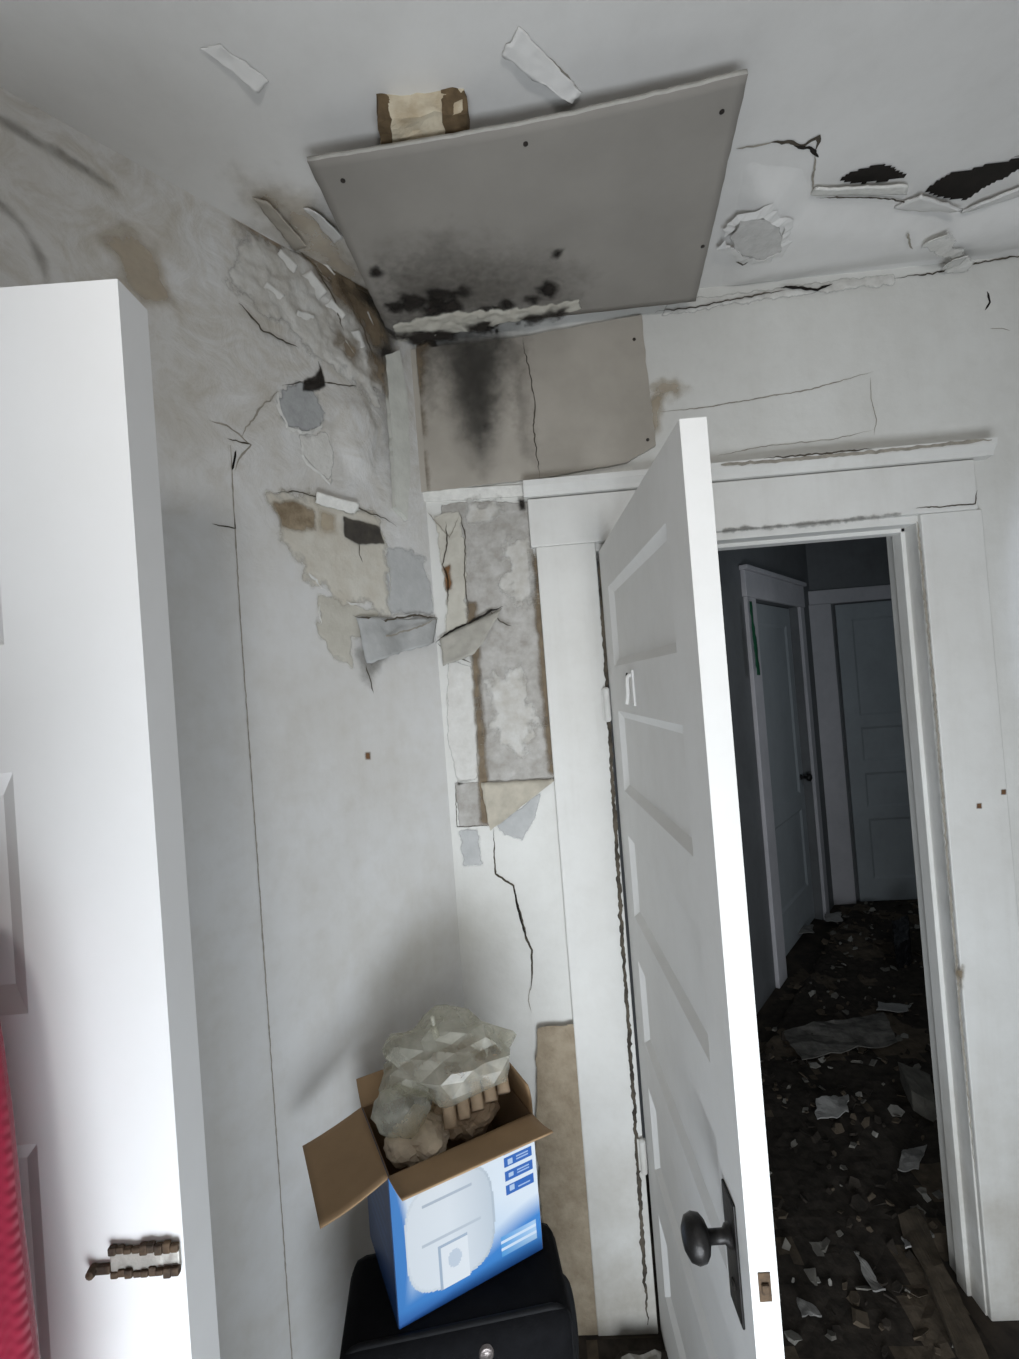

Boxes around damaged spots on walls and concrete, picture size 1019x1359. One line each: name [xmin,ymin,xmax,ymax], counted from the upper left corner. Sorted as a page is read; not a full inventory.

damp [241,223,289,252]
damp [290,213,566,395]
peeling [717,203,794,266]
peeling [907,232,973,274]
flaking render [226,197,554,866]
crack [493,832,533,1010]